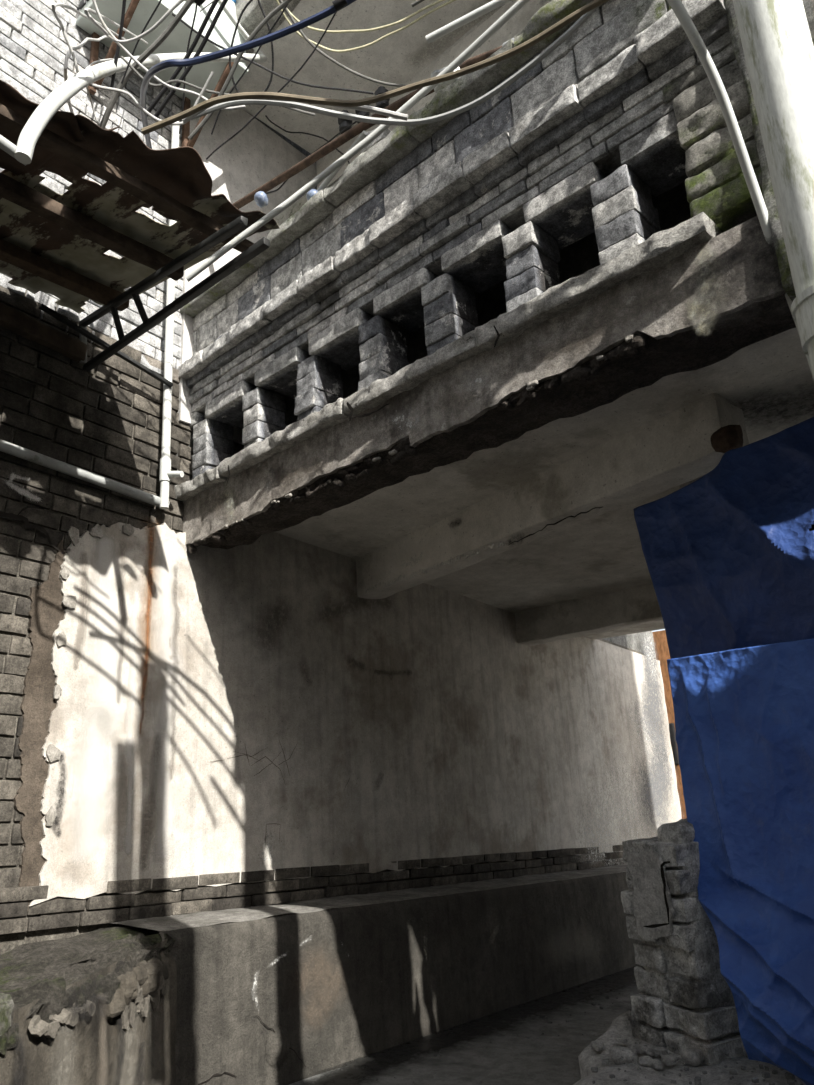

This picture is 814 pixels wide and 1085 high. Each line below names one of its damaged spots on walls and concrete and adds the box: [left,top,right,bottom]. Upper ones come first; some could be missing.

spalling [497,333,650,410]
spalling [271,440,421,509]
flaking render [68,523,102,546]
crack [509,507,602,545]
flaking render [56,632,67,647]
flaking render [62,595,77,609]
rust [140,527,154,734]
spalling [28,958,170,1038]